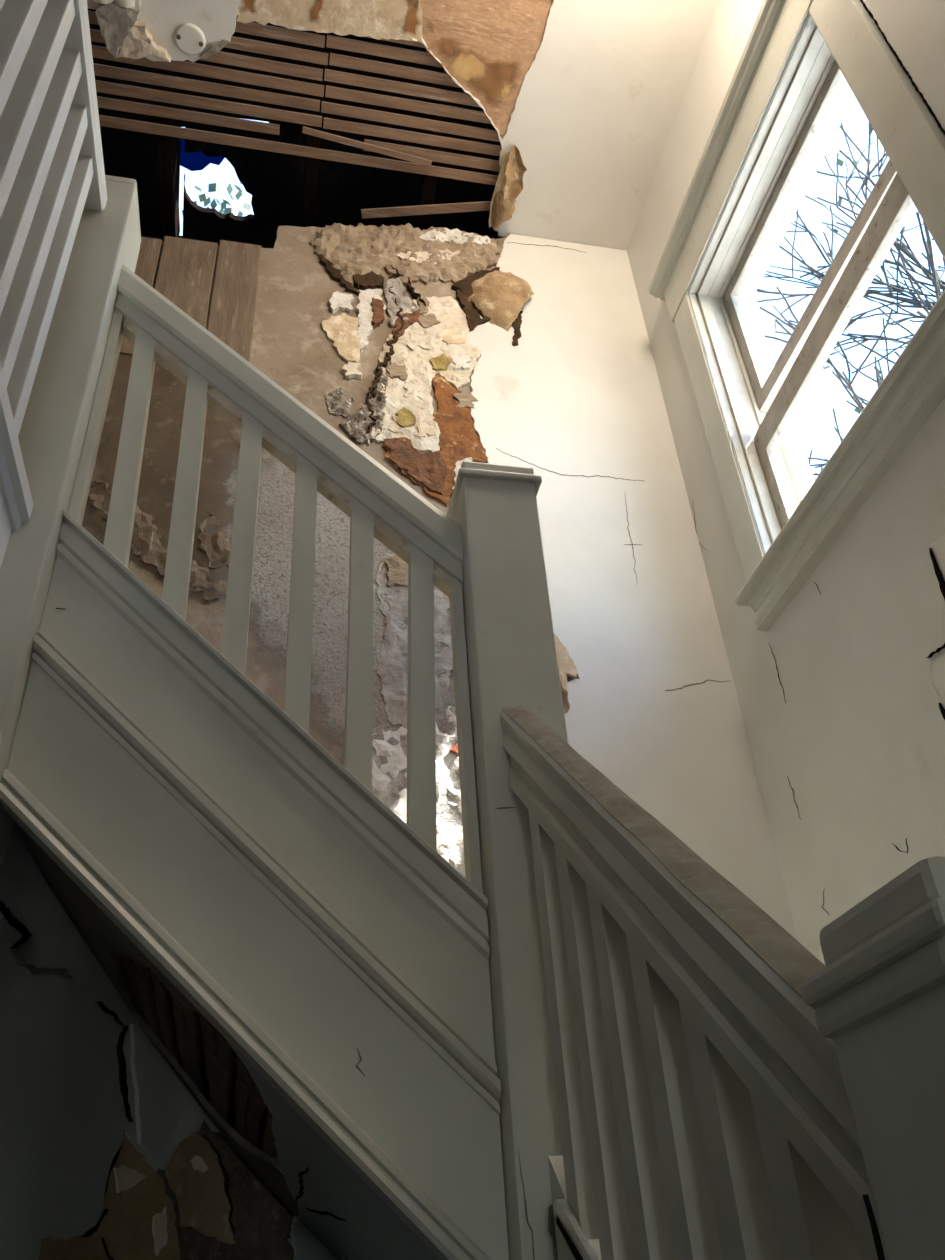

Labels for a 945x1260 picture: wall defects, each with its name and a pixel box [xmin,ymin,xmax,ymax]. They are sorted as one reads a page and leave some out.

flaking render [95,1,171,62]
flaking render [236,0,554,453]
flaking render [452,457,473,491]
crack [496,448,643,579]
crack [665,680,725,691]
crack [926,643,945,658]
crack [0,901,72,978]
crack [96,1001,134,1122]
peeling [39,1024,236,1260]
crack [295,1166,346,1221]